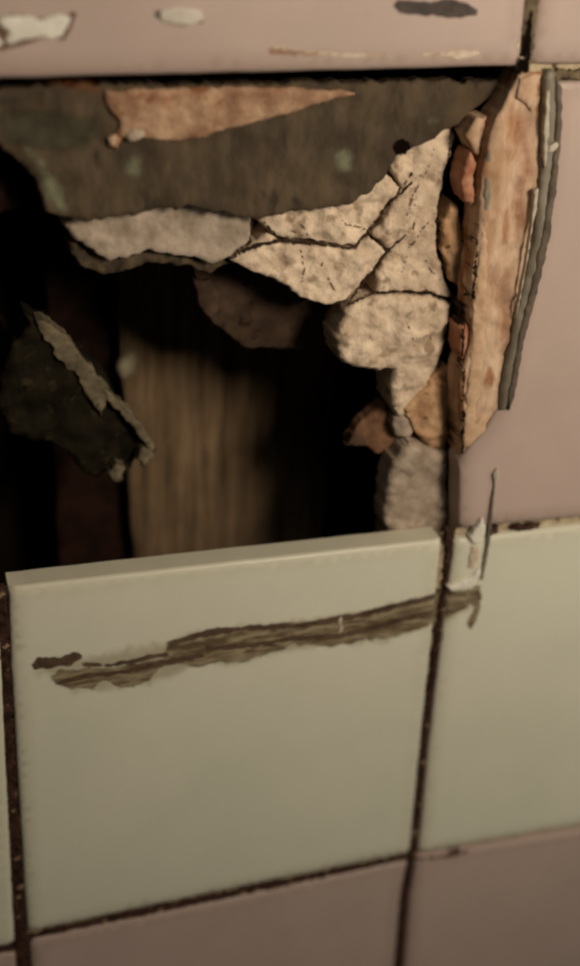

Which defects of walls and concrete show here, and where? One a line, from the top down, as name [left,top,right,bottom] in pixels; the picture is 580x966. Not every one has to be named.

spalling [0,12,76,50]
spalling [156,7,203,26]
spalling [0,66,542,538]
crack [230,138,479,526]
spalling [0,414,54,586]